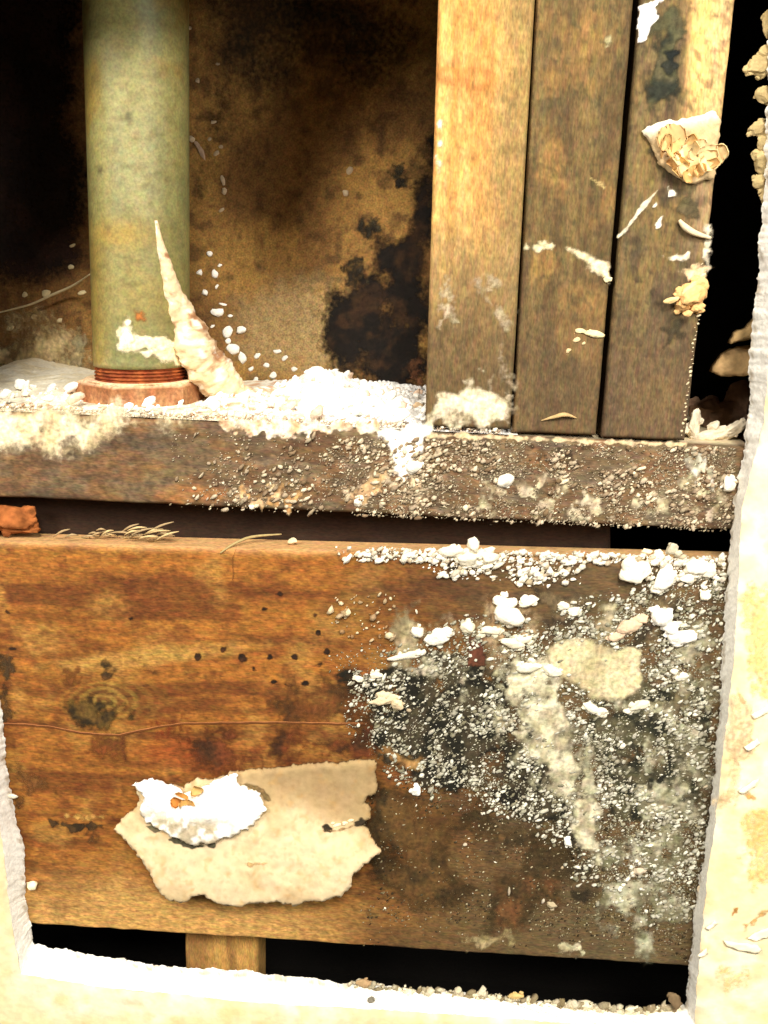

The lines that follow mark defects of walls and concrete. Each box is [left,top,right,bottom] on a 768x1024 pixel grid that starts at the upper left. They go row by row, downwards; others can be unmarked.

damp [322,134,434,386]
damp [171,432,736,532]
damp [0,654,15,723]
damp [63,666,80,685]
damp [100,661,115,680]
damp [64,696,127,761]
crack [3,721,363,736]
damp [190,727,246,775]
damp [268,573,728,962]